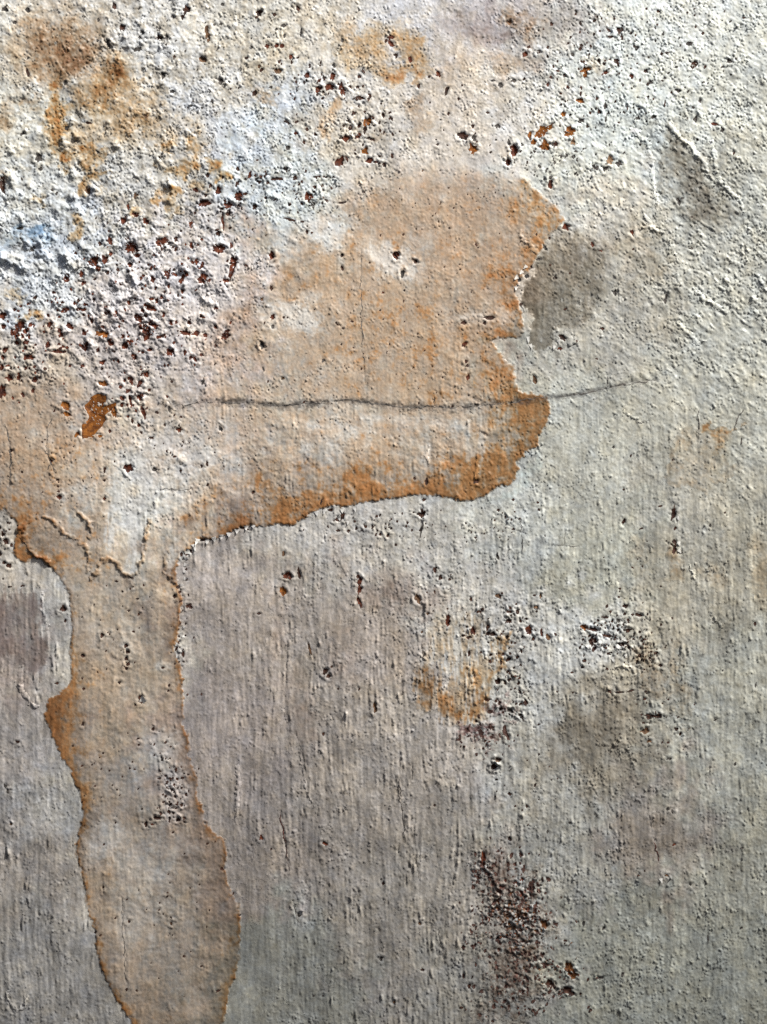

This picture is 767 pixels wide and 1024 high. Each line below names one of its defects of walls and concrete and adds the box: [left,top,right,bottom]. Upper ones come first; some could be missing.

corrosion [579,48,614,77]
crack [170,250,660,414]
leakage [502,113,743,366]
corrosion [0,0,566,1024]